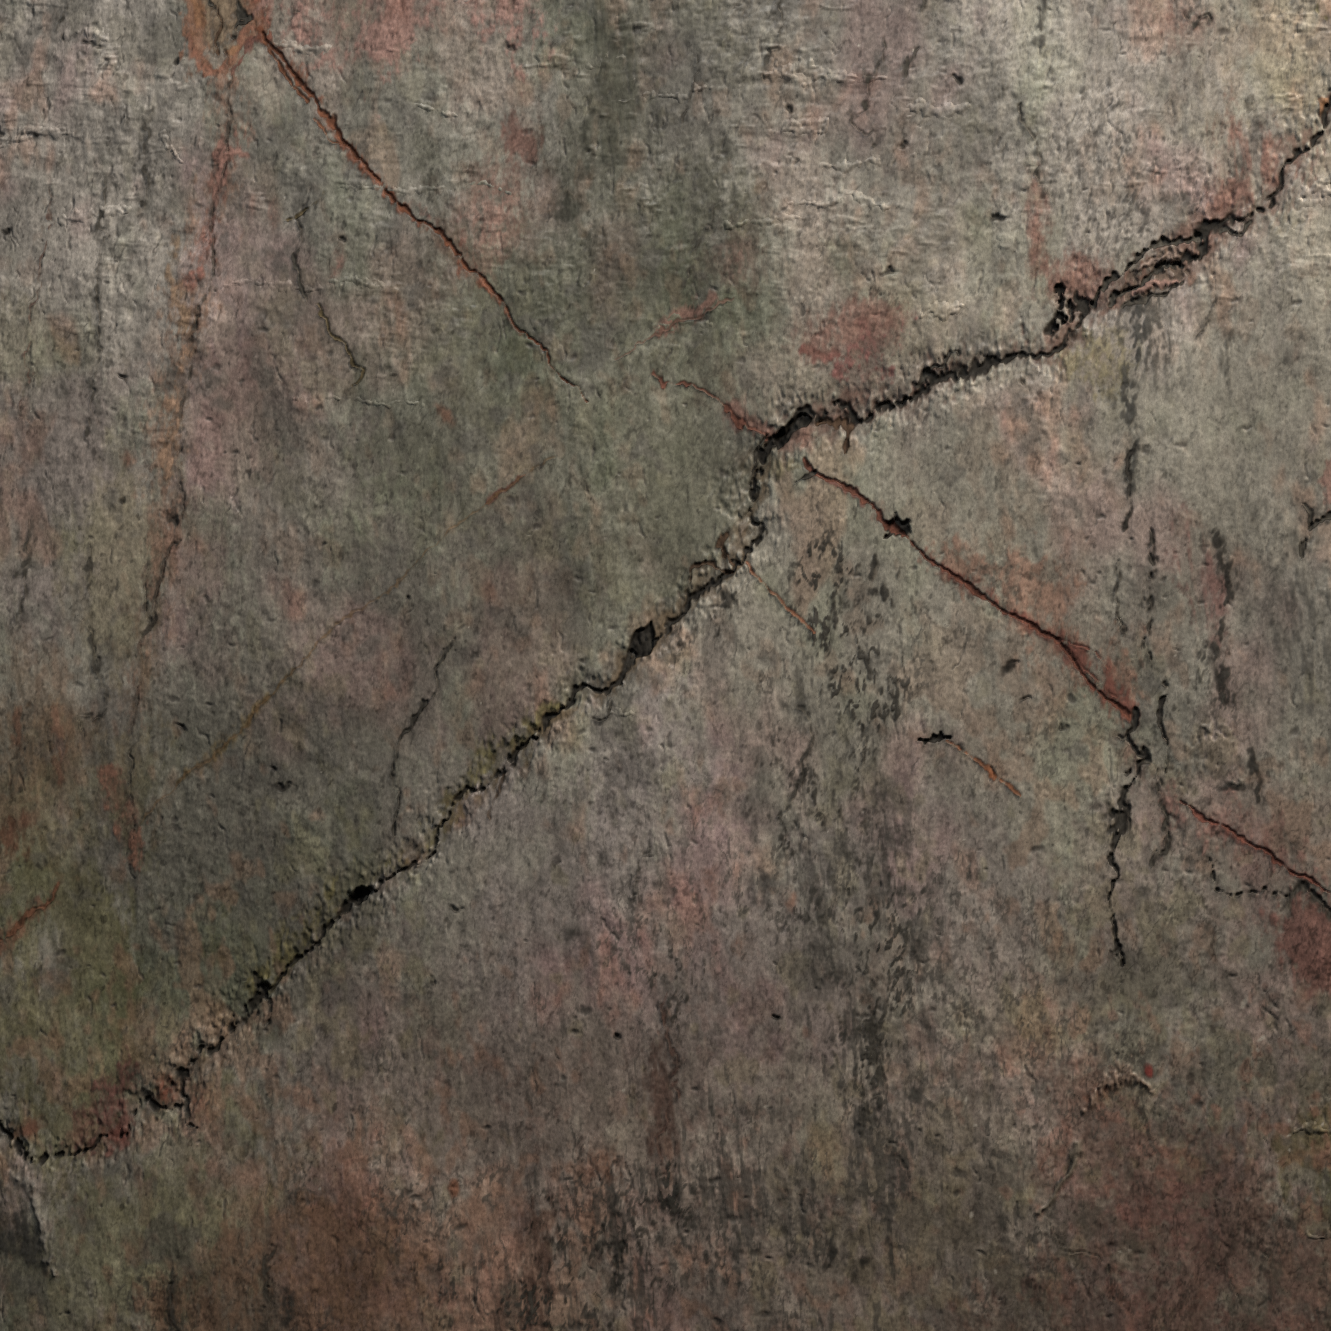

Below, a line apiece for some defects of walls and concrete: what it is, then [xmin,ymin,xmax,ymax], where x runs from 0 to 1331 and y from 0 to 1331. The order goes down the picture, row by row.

rust [180,0,439,105]
rust [466,0,546,81]
crack [849,40,919,147]
crack [1184,13,1212,28]
crack [95,182,110,239]
crack [208,0,588,402]
rust [151,396,180,599]
crack [15,519,31,629]
crack [133,96,1331,1128]
crack [77,544,138,839]
rust [1198,806,1331,995]
crack [0,1124,128,1165]